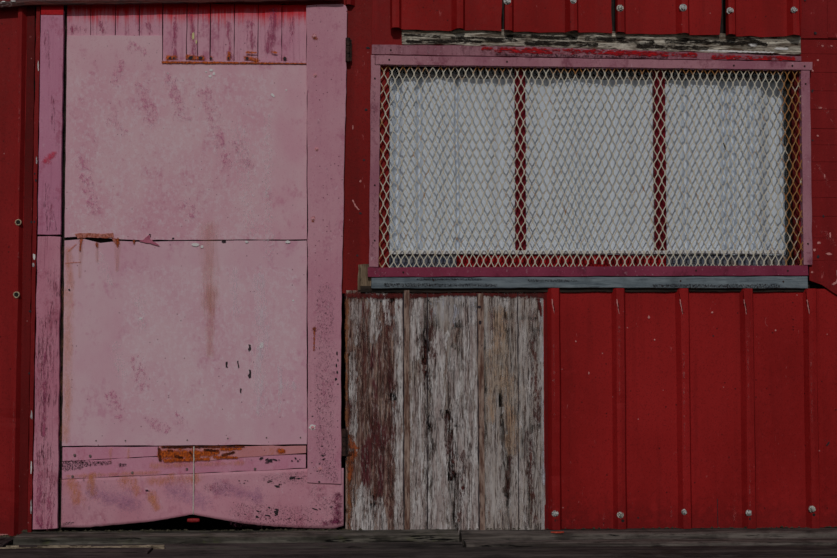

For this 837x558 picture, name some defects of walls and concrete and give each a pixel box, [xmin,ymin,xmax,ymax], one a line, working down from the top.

corrosion [162,51,306,64]
peeling [481,43,796,61]
corrosion [75,233,119,251]
peeling [346,289,558,533]
corrosion [157,447,242,463]